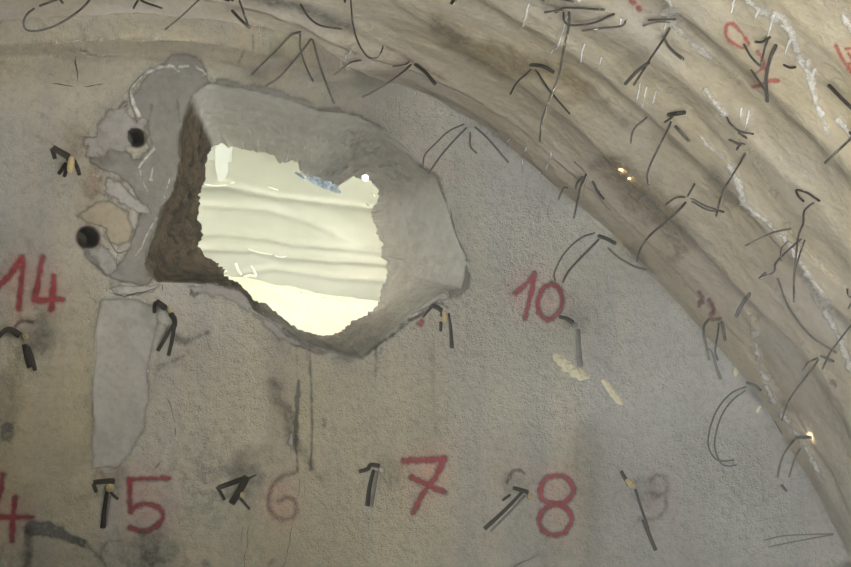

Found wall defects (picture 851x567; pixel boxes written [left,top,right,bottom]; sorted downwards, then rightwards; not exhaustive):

spalling [190,284,324,354]
spalling [367,266,470,354]
leakage [24,521,106,567]